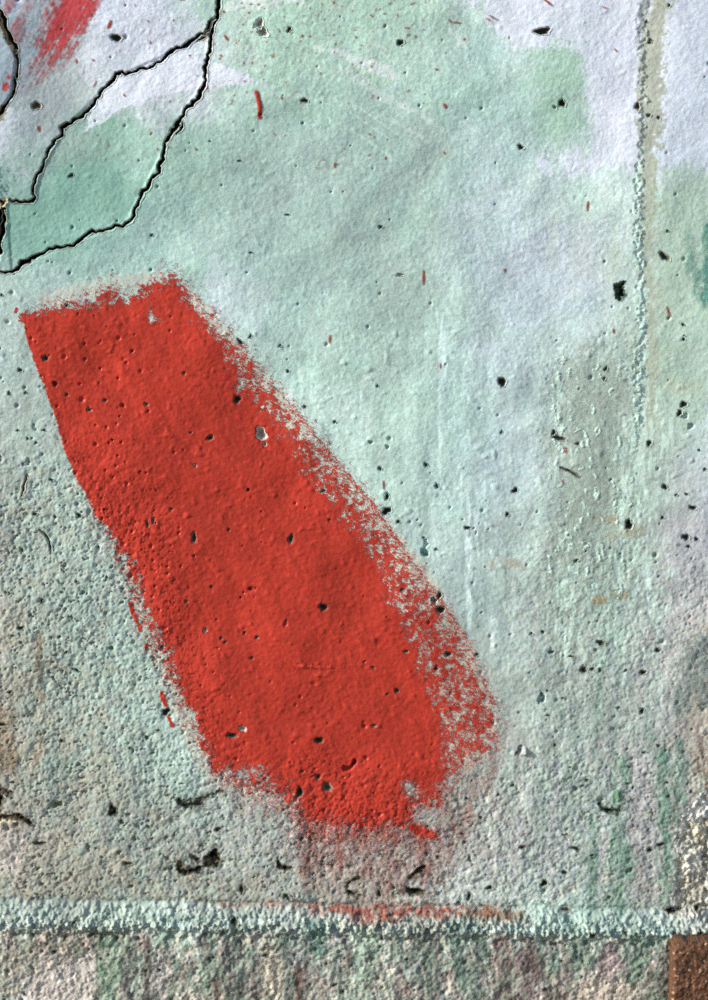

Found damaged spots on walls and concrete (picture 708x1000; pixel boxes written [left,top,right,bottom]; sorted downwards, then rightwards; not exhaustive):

crack [0,0,222,275]